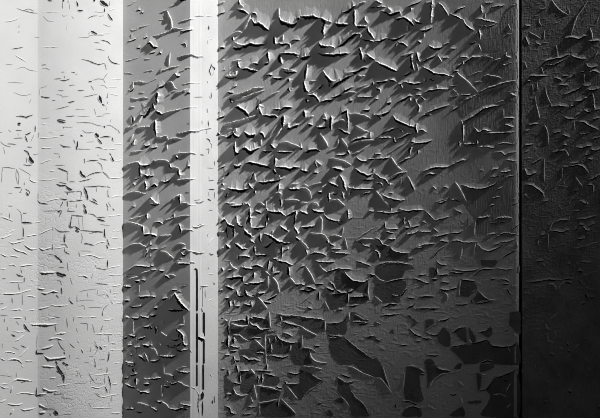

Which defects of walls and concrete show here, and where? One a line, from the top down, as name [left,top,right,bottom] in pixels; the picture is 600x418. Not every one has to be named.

peeling [124,0,198,208]
peeling [217,0,600,418]
peeling [123,214,194,413]